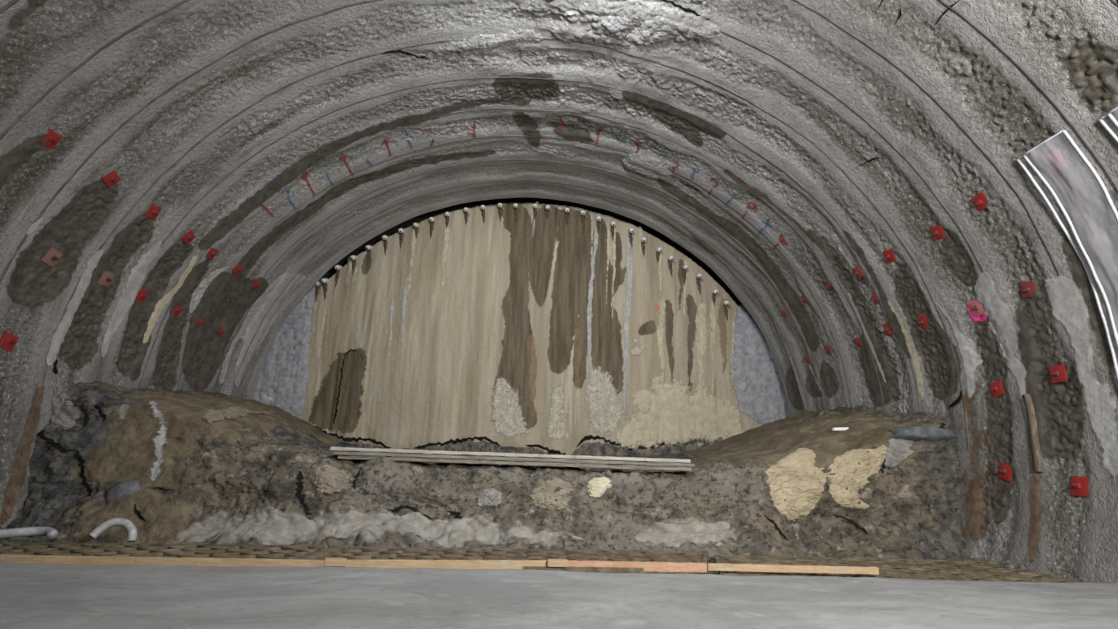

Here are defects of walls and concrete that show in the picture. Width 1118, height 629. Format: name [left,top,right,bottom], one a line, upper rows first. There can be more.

crack [663,0,710,20]
leakage [0,71,593,390]
leakage [309,348,366,433]
leakage [464,202,745,451]